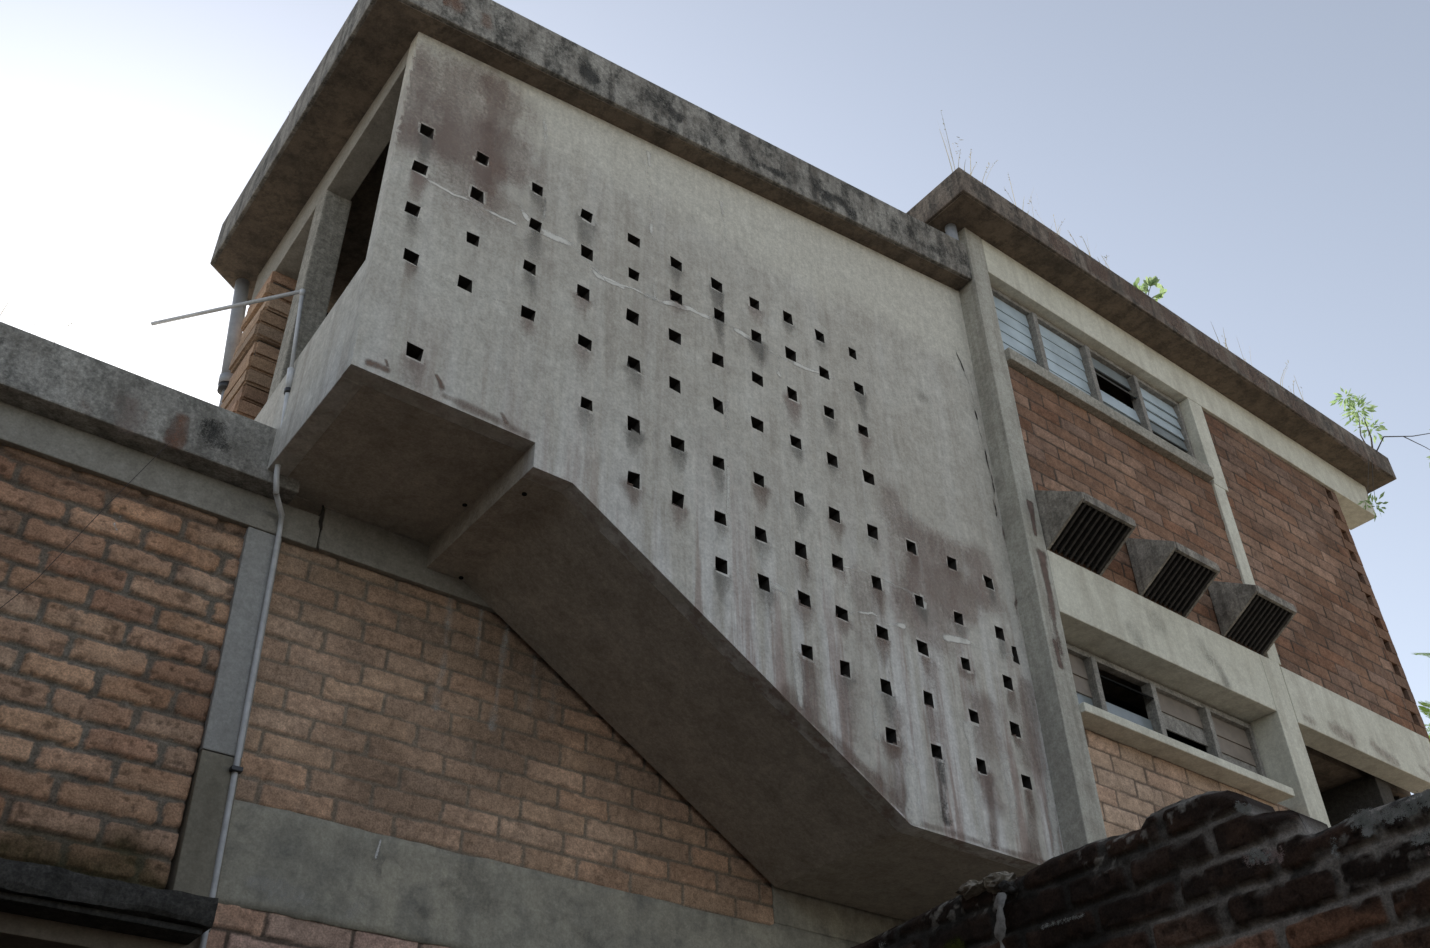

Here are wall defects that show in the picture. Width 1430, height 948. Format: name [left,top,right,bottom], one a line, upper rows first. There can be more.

crack [426,179,751,341]
crack [777,362,832,379]
leakage [909,526,993,638]
leakage [784,651,814,717]
leakage [840,693,921,825]
leakage [937,760,952,825]
leakage [964,700,1060,864]